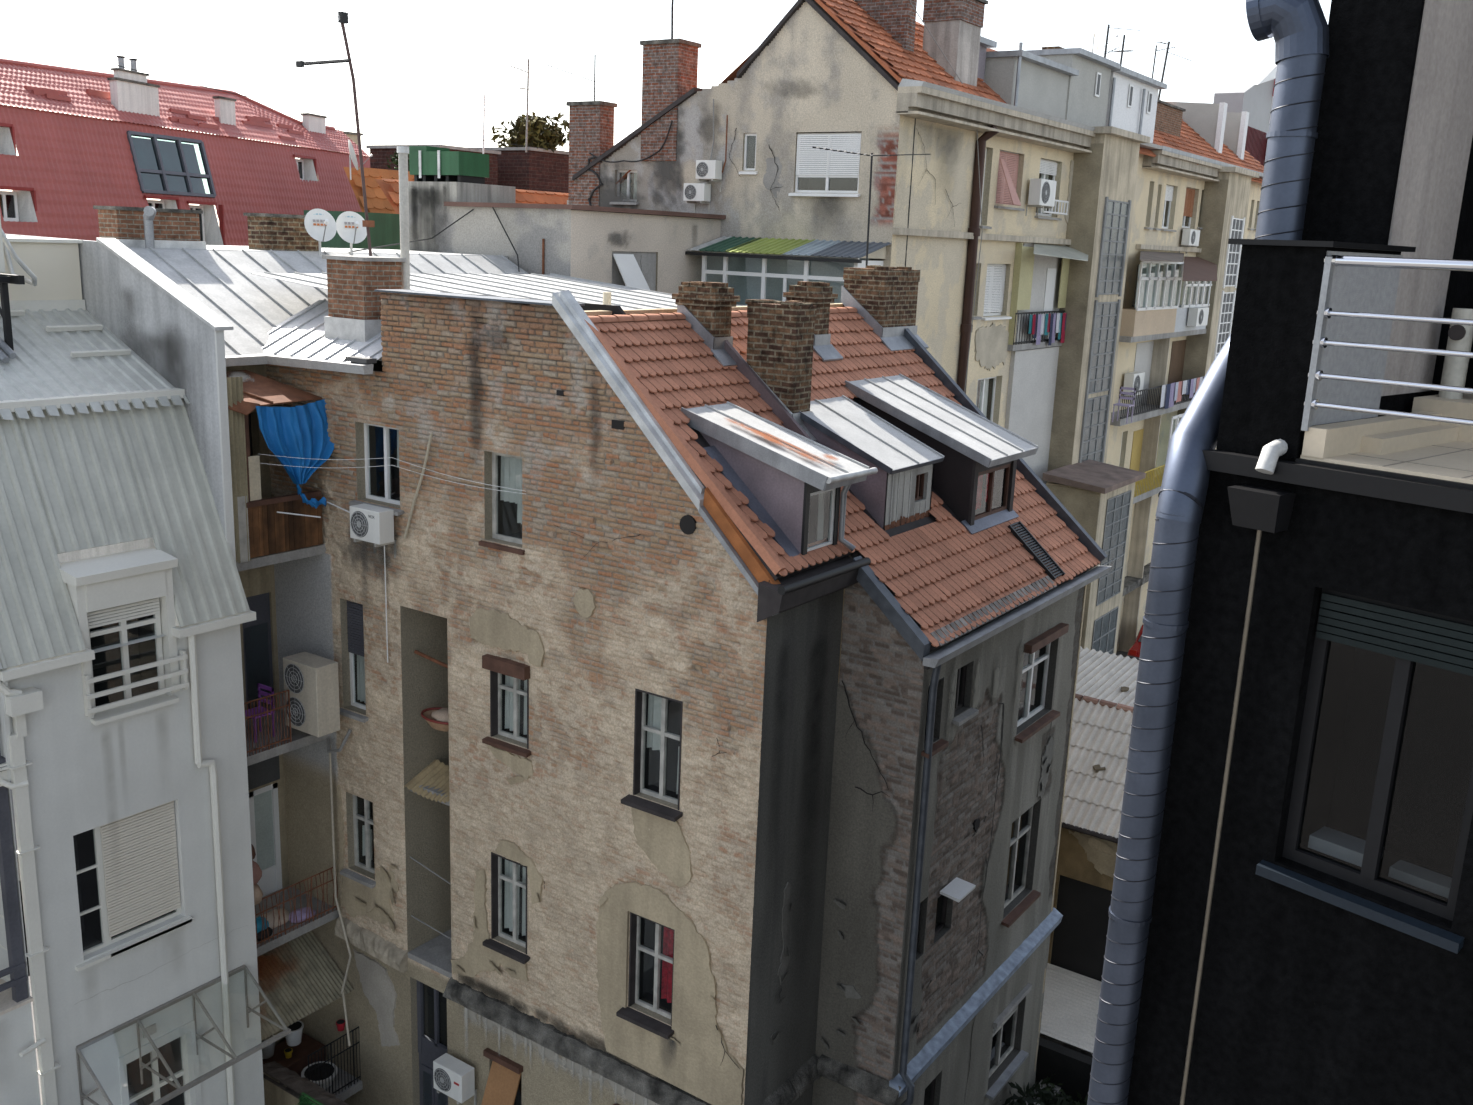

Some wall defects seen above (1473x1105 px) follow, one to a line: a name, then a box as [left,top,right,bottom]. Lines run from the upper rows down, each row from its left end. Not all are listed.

crack [842,680,889,811]